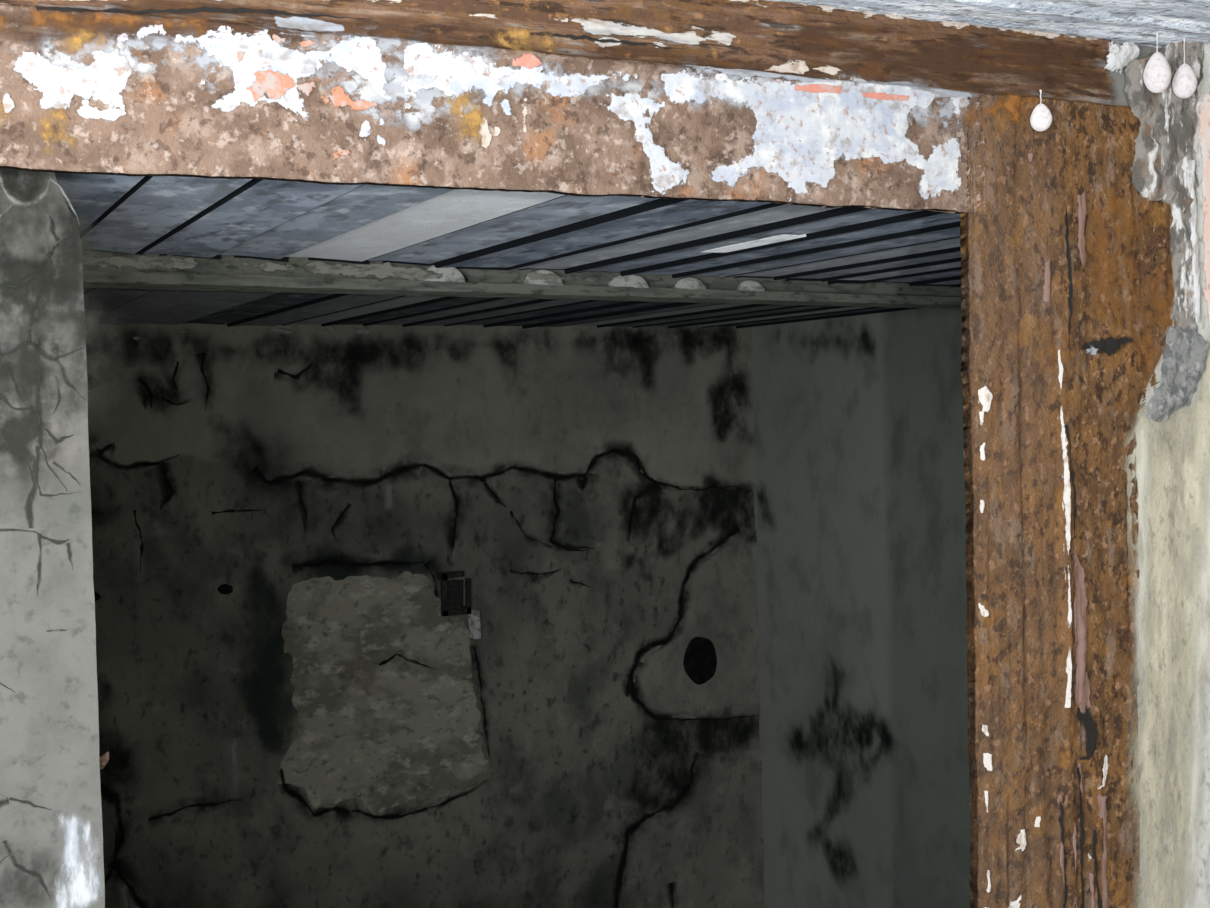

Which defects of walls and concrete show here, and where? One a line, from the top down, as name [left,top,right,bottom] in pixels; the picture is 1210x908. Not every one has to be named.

rust [0,0,530,50]
rust [448,96,483,137]
peeling [14,16,972,202]
rust [584,26,1112,123]
spalling [1105,40,1210,422]
leakage [1188,160,1200,322]
crack [0,215,179,594]
leakage [680,327,748,440]
crack [212,445,745,598]
spalling [277,571,493,816]
crack [624,527,757,723]
leakage [1127,349,1210,908]